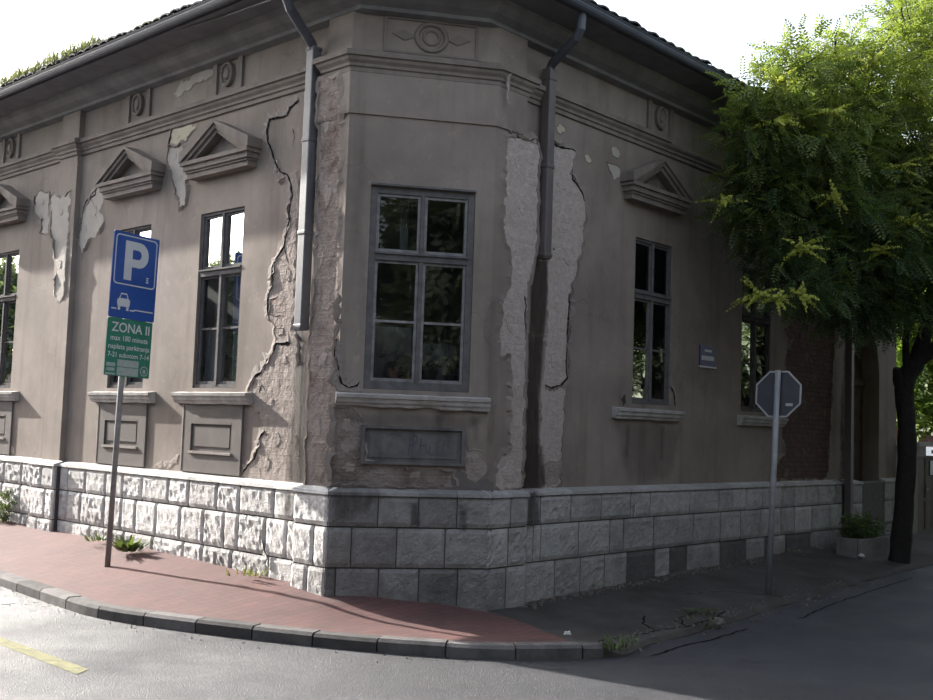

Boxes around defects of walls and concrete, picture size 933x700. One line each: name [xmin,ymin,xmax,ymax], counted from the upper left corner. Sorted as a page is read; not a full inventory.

flaking render [165,123,198,212]
flaking render [606,146,621,181]
flaking render [34,186,106,304]
crack [247,95,299,392]
flaking render [241,71,592,491]
flaking render [769,299,836,482]
crack [240,427,265,476]